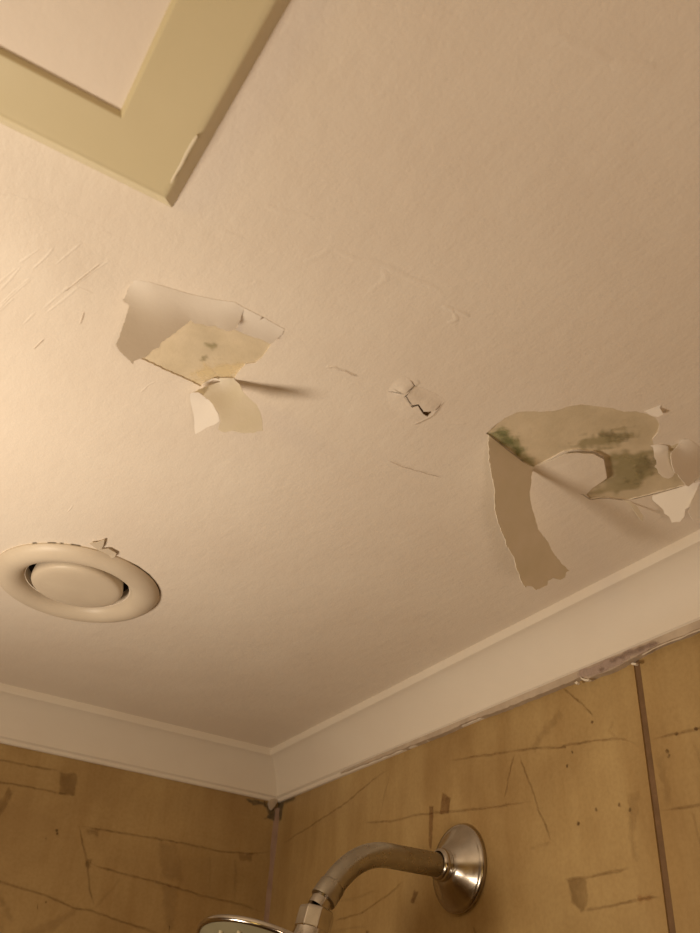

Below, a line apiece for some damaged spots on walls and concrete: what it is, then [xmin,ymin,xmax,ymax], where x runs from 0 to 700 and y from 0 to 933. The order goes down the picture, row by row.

peeling [116,280,284,434]
peeling [487,404,700,590]